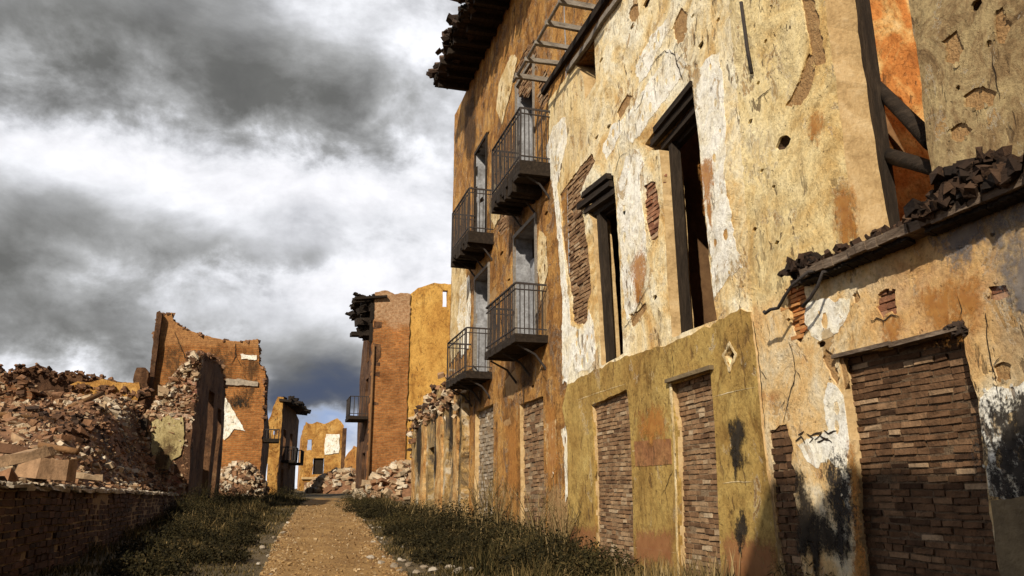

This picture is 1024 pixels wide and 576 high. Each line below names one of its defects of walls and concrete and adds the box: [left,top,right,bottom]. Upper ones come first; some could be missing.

spalling [787,0,826,107]
spalling [946,82,997,142]
peeling [537,8,744,384]
spalling [874,285,897,318]
crack [753,322,801,424]
leakage [728,417,747,480]
spalling [770,286,860,576]
leakage [970,384,1024,502]
leakage [722,510,778,576]
leakage [800,540,820,576]